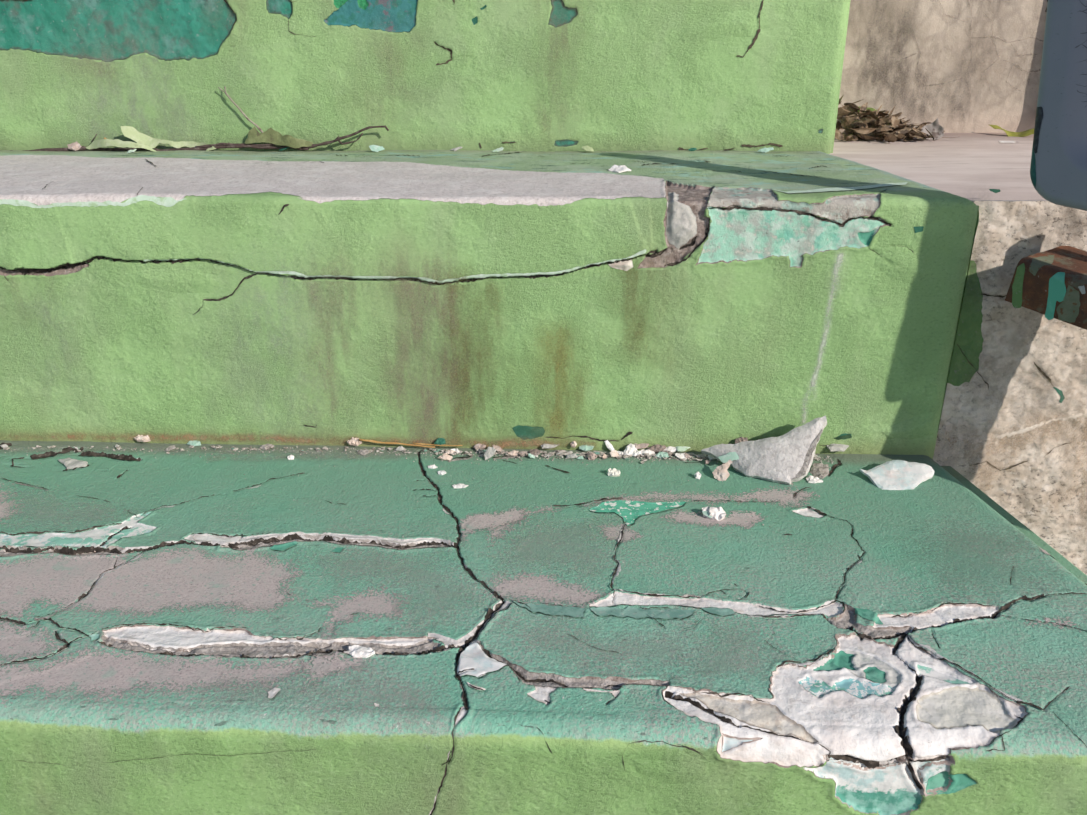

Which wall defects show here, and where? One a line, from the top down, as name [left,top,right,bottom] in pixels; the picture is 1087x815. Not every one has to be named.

peeling [0,0,237,62]
peeling [266,0,292,19]
peeling [324,0,418,33]
crack [434,42,452,65]
peeling [548,0,578,28]
crack [736,1,763,57]
peeling [0,126,908,283]
crack [0,191,892,315]
crack [545,432,633,442]
crack [0,442,621,815]
spalling [0,444,1029,815]
crack [553,443,1087,790]